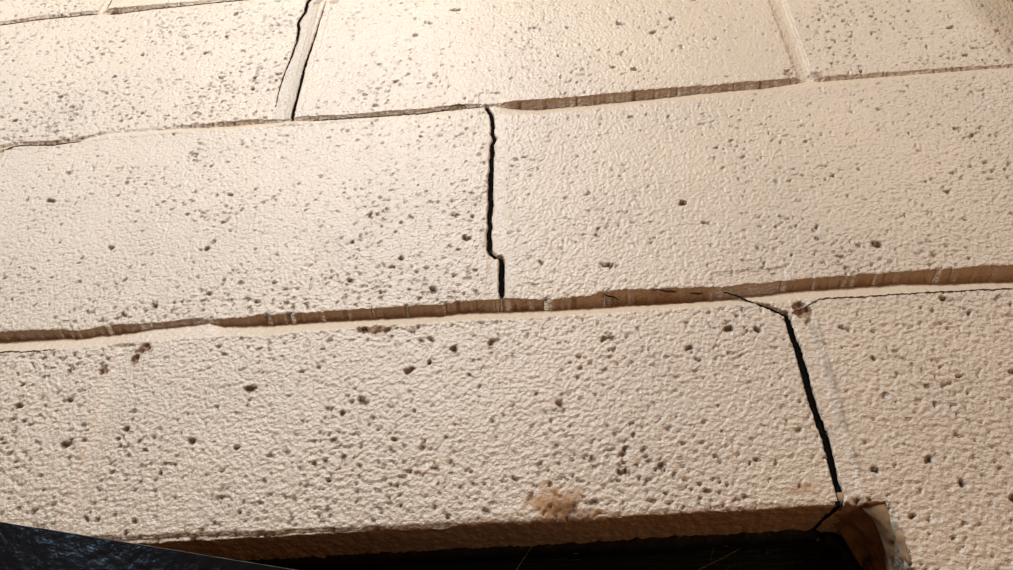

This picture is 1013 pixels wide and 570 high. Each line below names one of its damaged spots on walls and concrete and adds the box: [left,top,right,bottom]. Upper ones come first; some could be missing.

crack [1,0,244,25]
crack [3,141,81,152]
crack [275,0,505,299]
crack [651,288,1013,530]